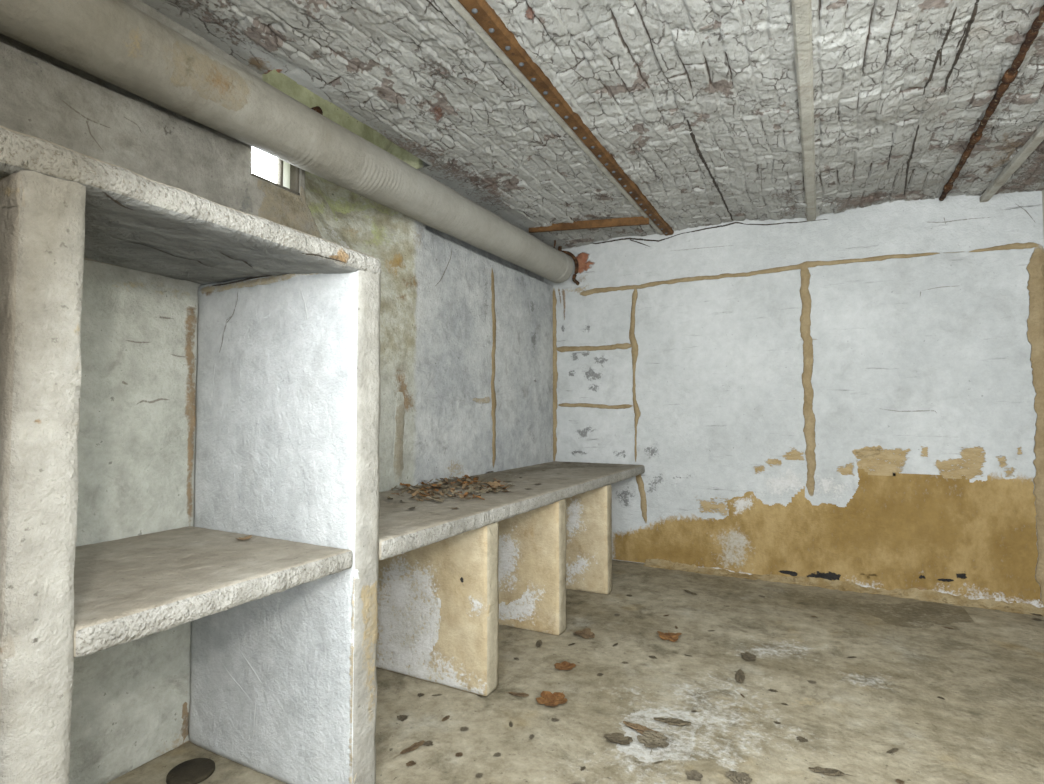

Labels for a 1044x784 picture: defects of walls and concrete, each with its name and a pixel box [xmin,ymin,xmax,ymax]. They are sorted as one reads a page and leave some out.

crack [426,0,469,41]
crack [923,0,980,94]
crack [60,99,143,152]
crack [887,123,920,196]
crack [590,118,829,251]
corrosion [529,216,649,233]
crack [927,216,992,225]
peeling [752,445,806,475]
peeling [833,444,1024,483]
peeling [953,570,971,581]